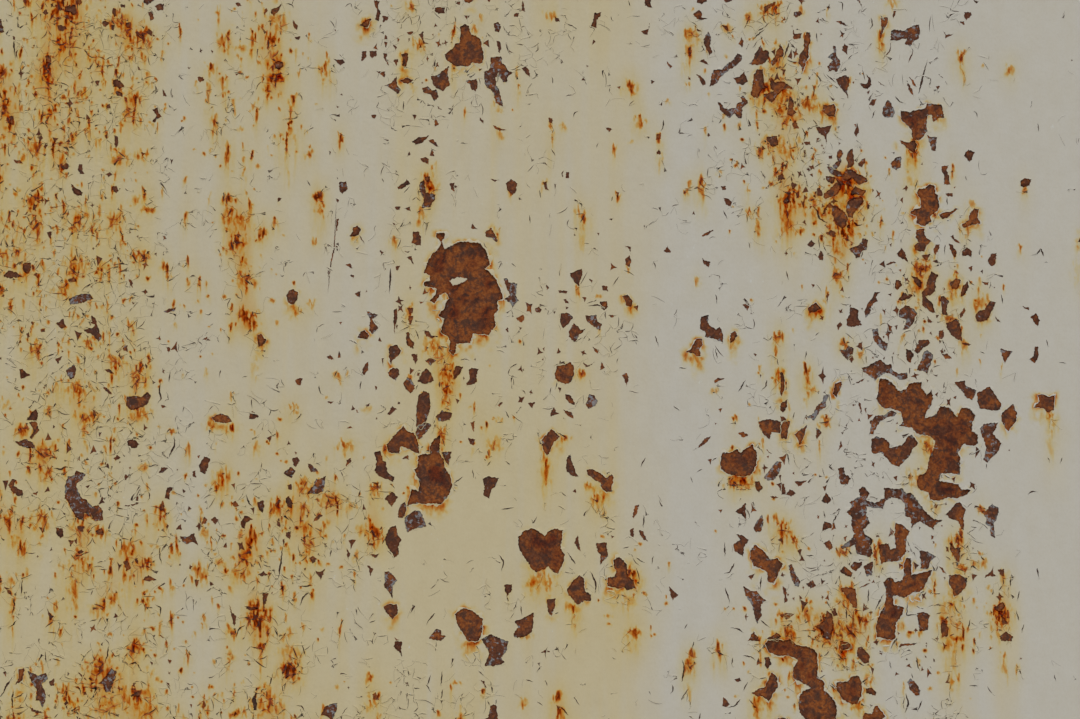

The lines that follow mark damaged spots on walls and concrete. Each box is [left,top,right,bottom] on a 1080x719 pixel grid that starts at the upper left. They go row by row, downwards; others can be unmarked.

peeling [361,21,531,109]
peeling [826,43,946,171]
rust [224,193,276,261]
rust [778,189,857,252]
peeling [814,124,868,237]
rust [224,296,257,331]
peeling [367,223,542,619]
peeling [720,165,1019,719]
peeling [55,469,106,554]
peeling [517,526,581,576]
rust [248,601,271,649]
peeling [454,573,592,668]